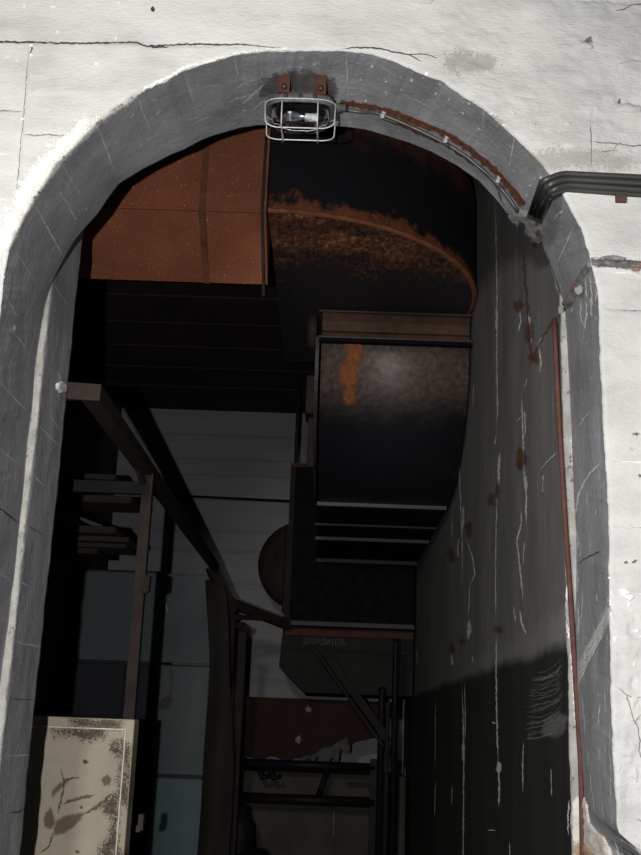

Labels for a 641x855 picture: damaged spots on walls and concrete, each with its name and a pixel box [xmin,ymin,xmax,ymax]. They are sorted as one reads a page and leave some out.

efflorescence [0,47,287,305]
corrosion [340,99,525,206]
corrosion [338,344,363,405]
crack [618,688,641,757]
spalling [571,794,623,855]